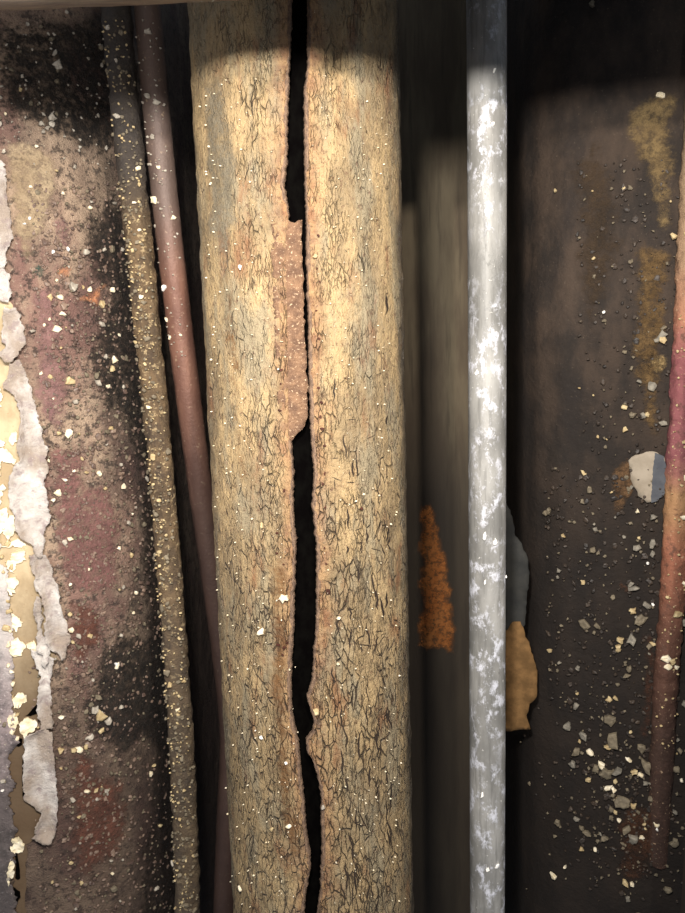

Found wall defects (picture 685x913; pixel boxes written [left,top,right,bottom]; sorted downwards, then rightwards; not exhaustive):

peeling [0,44,69,134]
peeling [23,22,101,118]
peeling [0,149,172,913]
crack [226,0,396,913]